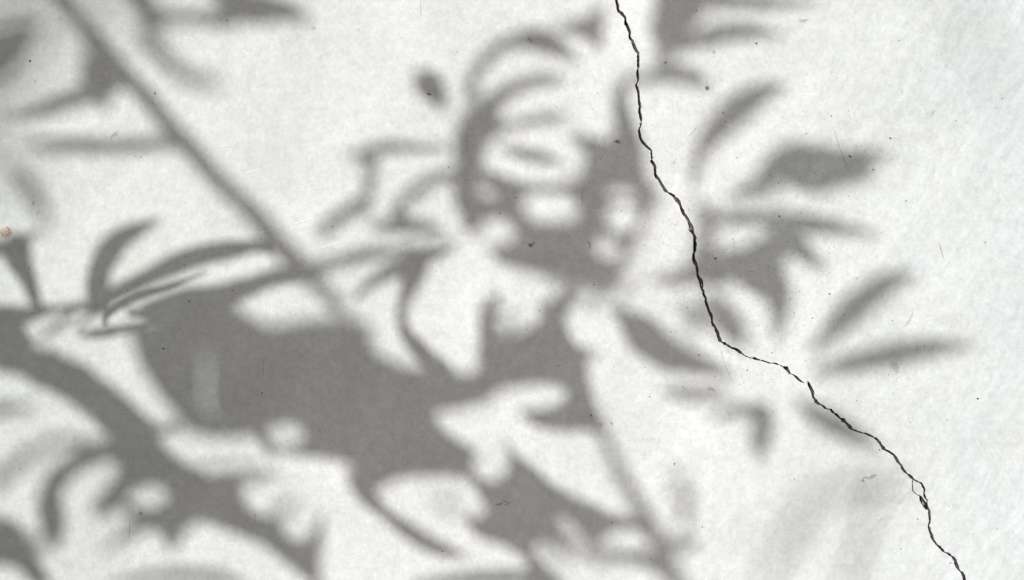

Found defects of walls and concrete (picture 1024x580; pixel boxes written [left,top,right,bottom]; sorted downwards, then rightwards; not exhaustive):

crack [615,0,966,580]